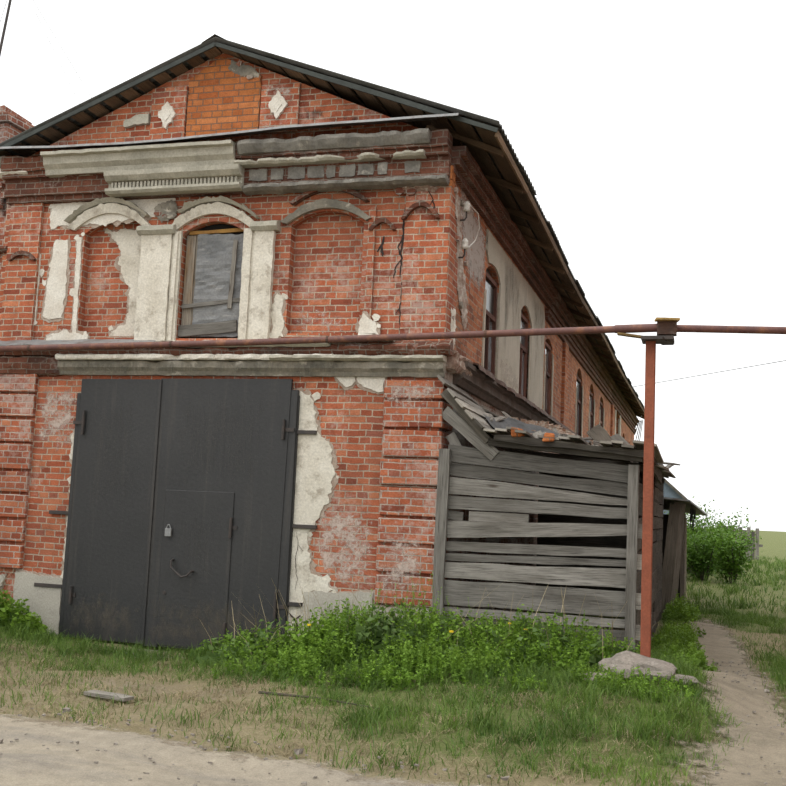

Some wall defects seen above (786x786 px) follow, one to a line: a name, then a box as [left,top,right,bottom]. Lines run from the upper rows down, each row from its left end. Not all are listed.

flaking render [34,198,178,340]
flaking render [269,290,288,338]
flaking render [355,311,381,335]
peeling [451,187,485,349]
flaking render [287,387,339,644]